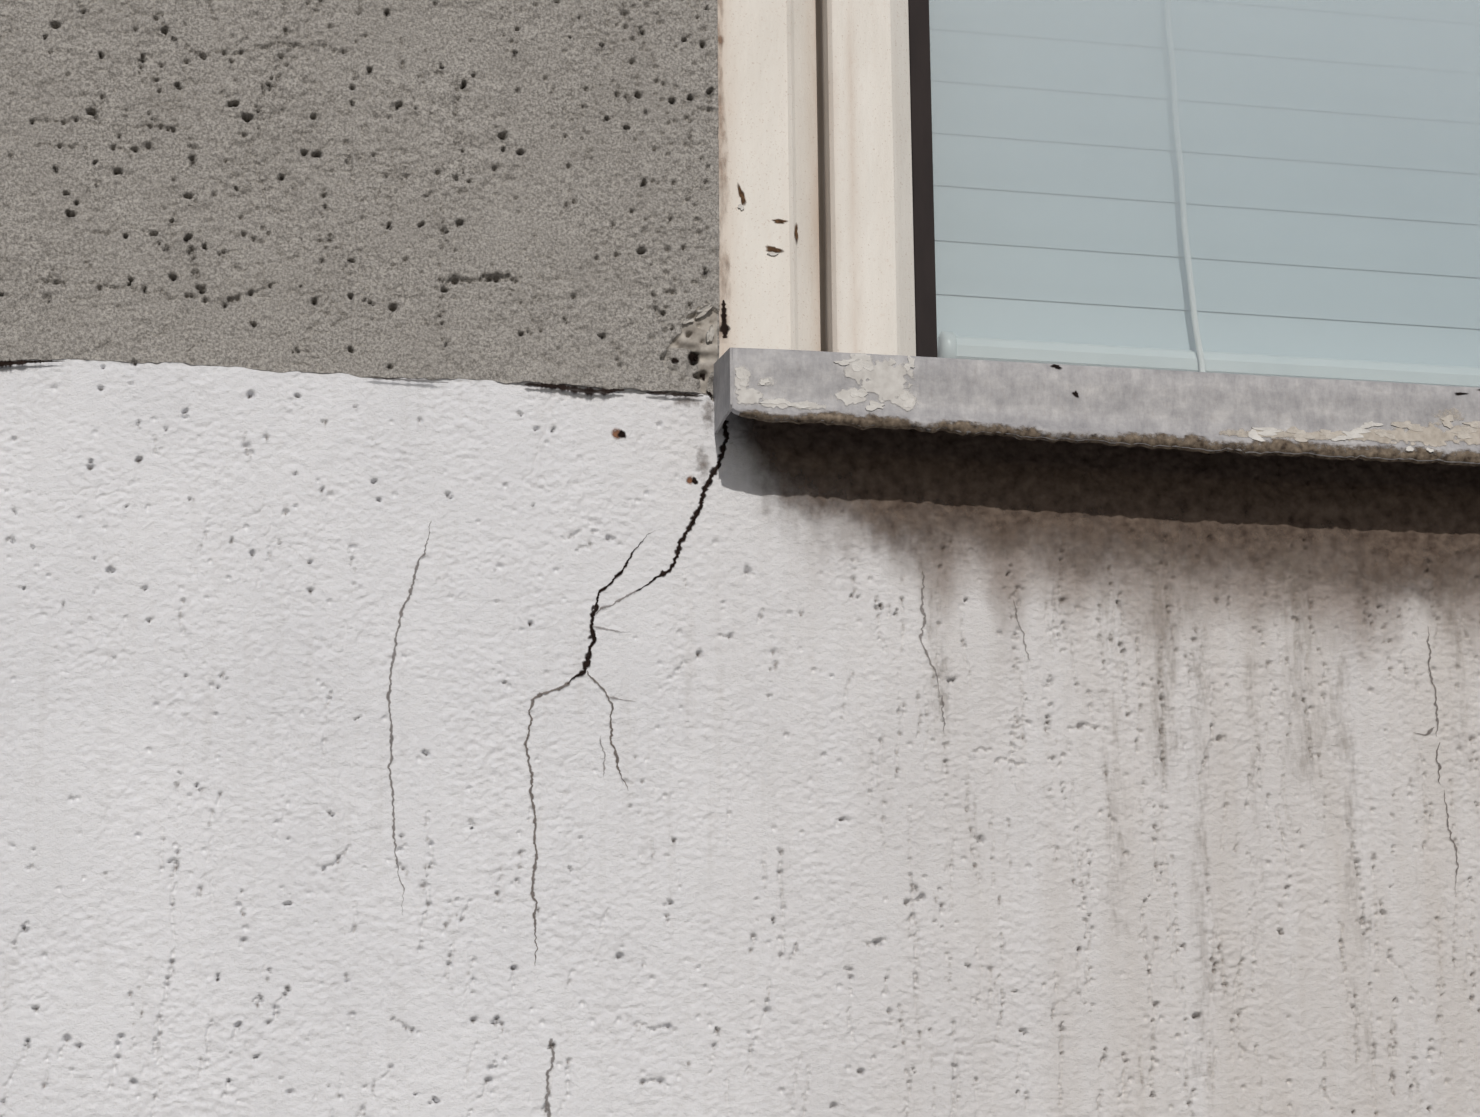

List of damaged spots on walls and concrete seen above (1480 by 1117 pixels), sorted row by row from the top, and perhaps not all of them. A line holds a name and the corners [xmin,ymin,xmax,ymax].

crack [368,375,448,383]
flaking render [668,305,718,402]
peeling [735,353,917,411]
peeling [1219,389,1480,447]
water stain [739,416,1480,613]
crack [524,383,729,961]